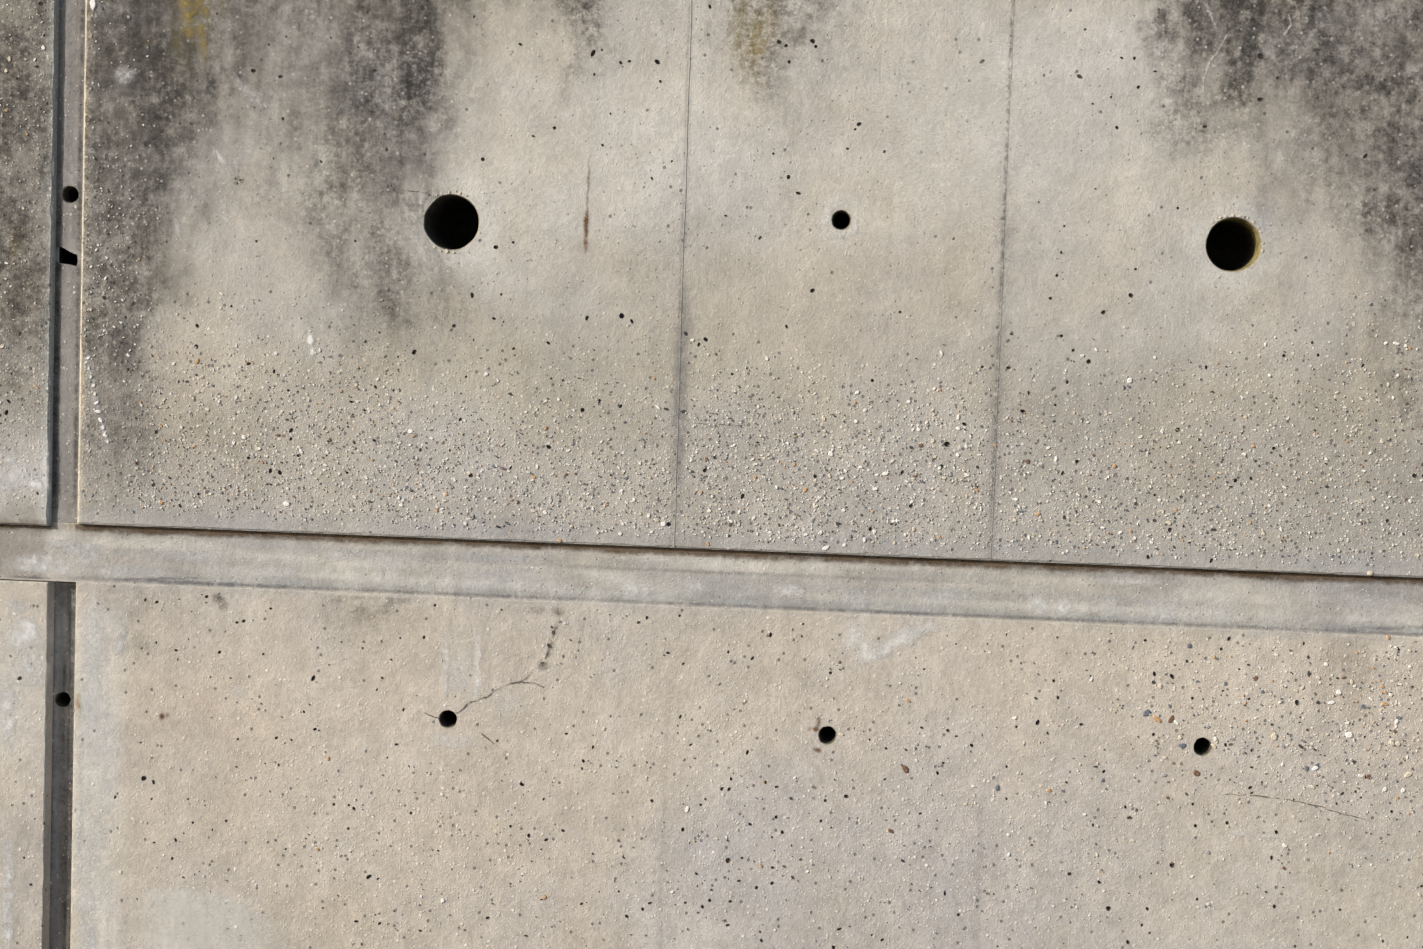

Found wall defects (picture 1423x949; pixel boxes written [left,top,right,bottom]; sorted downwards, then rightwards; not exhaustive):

water stain [0,27,50,174]
water stain [78,0,243,260]
water stain [351,0,433,121]
water stain [1157,0,1423,252]
water stain [0,178,151,435]
crack [425,607,559,744]